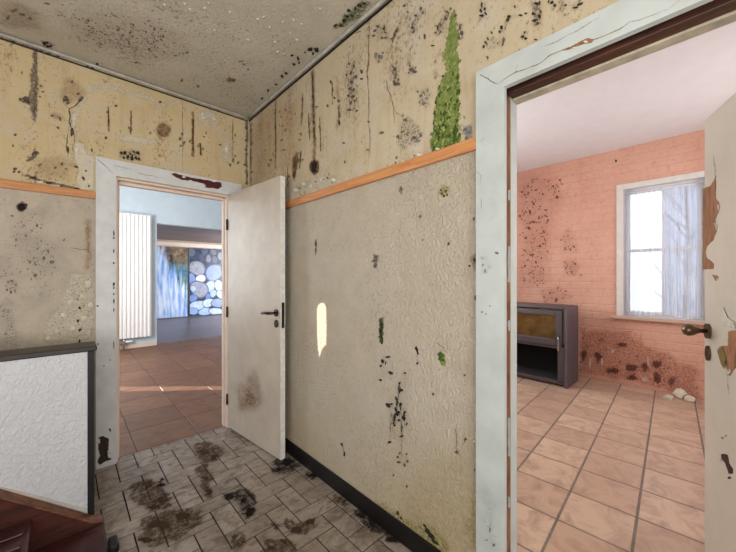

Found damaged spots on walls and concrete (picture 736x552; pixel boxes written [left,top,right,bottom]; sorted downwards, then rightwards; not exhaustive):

leakage [58,13,189,64]
crack [480,3,676,84]
leakage [12,40,60,121]
leakage [346,61,363,112]
leakage [121,119,172,143]
leakage [396,114,422,148]
peeling [172,173,222,189]
leakage [286,152,304,187]
leakage [519,178,563,286]
leakage [386,382,408,437]
peeling [98,428,112,465]